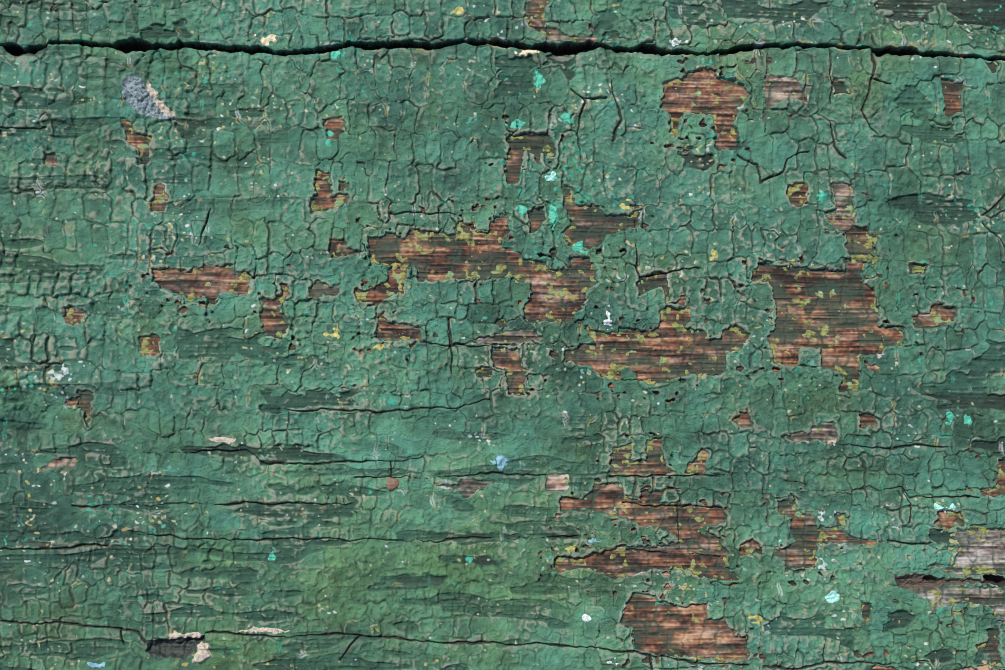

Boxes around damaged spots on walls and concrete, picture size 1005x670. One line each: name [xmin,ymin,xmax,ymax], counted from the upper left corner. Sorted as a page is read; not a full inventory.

crack [2,39,1005,159]
peeling [651,38,811,169]
peeling [142,261,301,352]
peeling [329,115,957,403]
crack [73,501,348,509]
crack [138,534,575,543]
crack [175,449,546,478]
crack [278,399,490,414]
peeling [539,433,768,667]
peeling [762,488,883,603]
peeling [893,458,1005,670]
crack [207,631,929,670]